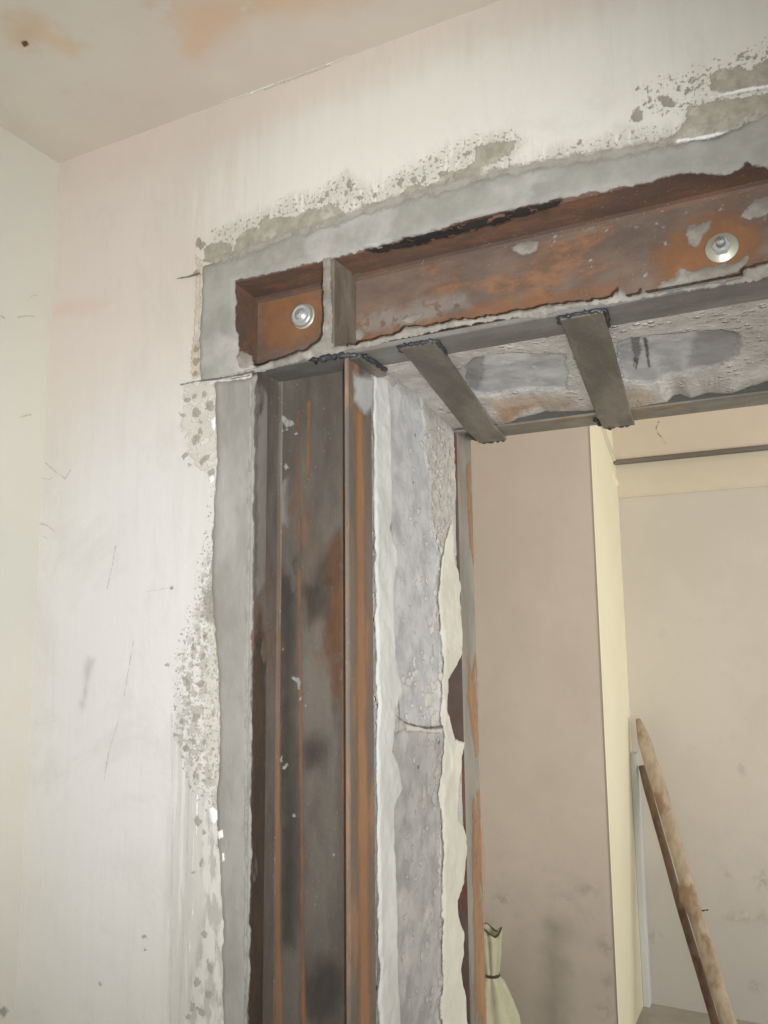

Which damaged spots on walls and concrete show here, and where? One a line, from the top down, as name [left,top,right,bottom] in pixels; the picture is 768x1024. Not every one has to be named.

peeling [180,47,768,487]
corrosion [665,220,753,281]
spalling [165,503,223,839]
corrosion [275,556,283,1024]
corrosion [329,410,370,1024]
spalling [389,382,456,1024]
corrosion [469,658,478,756]
corrosion [473,791,487,1024]